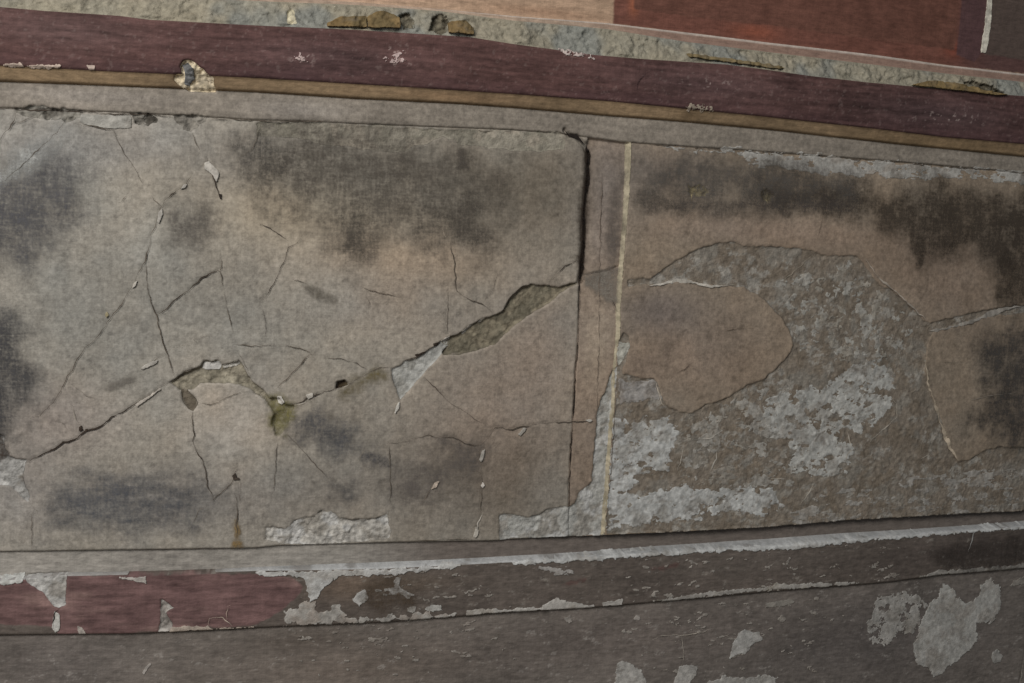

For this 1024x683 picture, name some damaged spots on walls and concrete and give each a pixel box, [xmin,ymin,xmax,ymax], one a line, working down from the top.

crack [0,108,385,461]
crack [386,131,617,541]
crack [187,392,241,537]
crack [273,435,326,493]
spalling [256,142,1024,683]
spalling [0,572,68,633]
spalling [158,599,253,632]